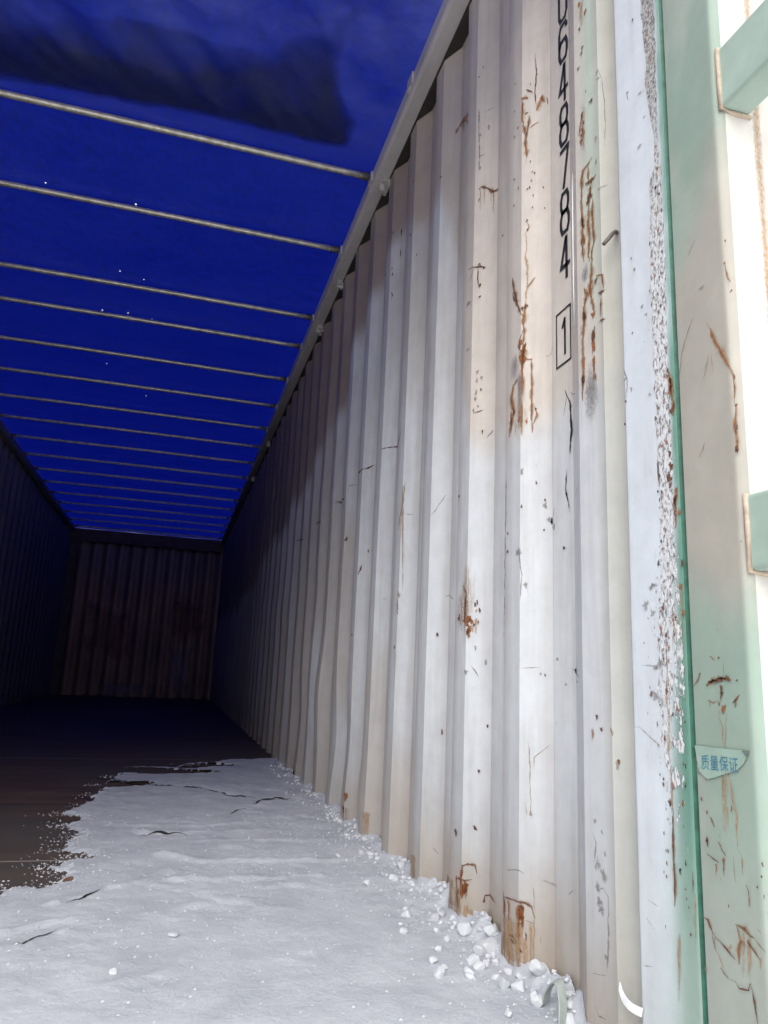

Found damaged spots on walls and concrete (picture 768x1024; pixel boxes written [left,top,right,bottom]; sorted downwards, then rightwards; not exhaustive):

corrosion [521,89,548,158]
corrosion [580,157,604,409]
peeling [626,0,686,835]
corrosion [707,324,739,453]
corrosion [458,586,481,637]
corrosion [693,656,739,747]
corrosion [447,863,477,917]
corrosion [501,887,535,963]